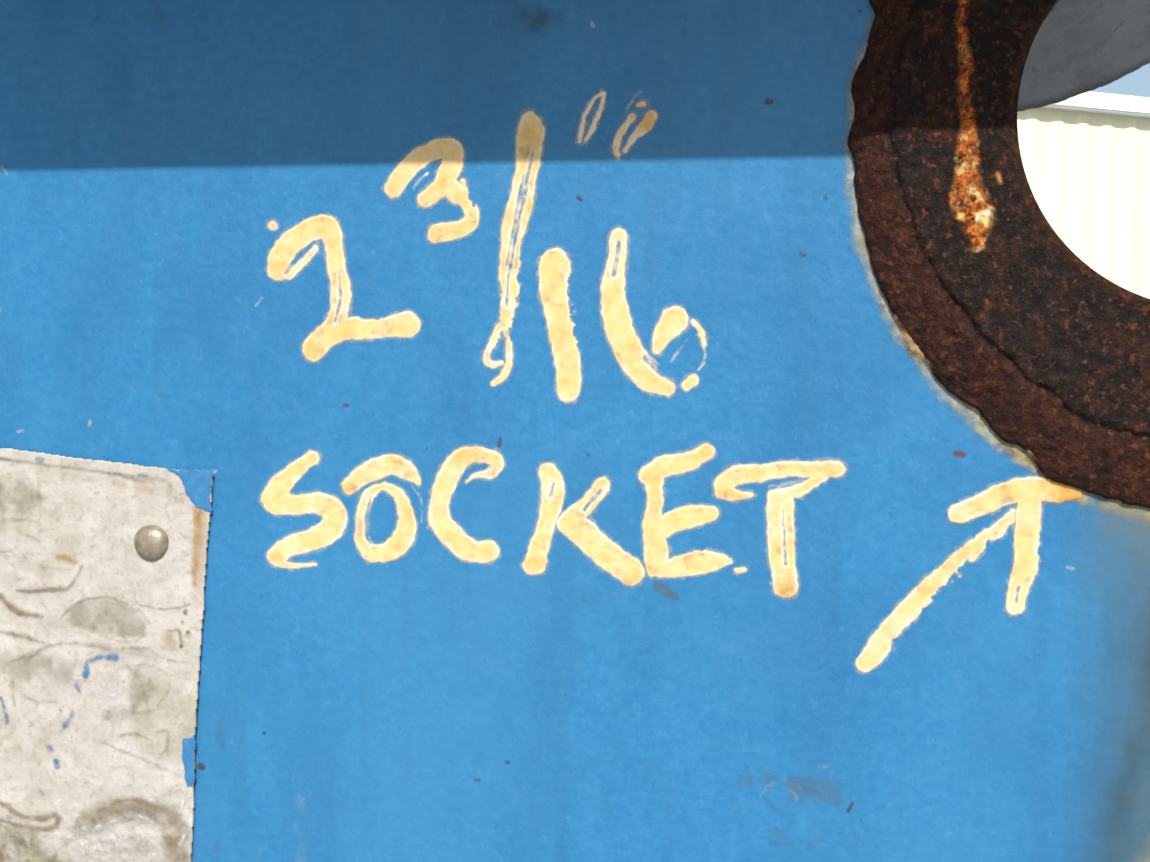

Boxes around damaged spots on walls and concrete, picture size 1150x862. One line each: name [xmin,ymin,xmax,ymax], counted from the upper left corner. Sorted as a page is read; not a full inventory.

rust [950,0,992,249]
rust [905,332,931,363]
leakage [1123,640,1150,862]